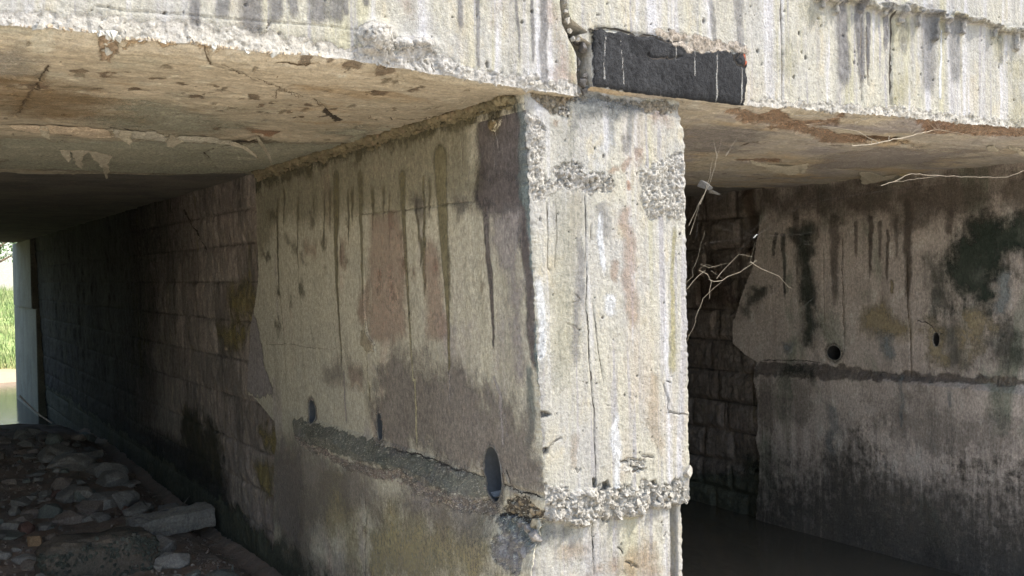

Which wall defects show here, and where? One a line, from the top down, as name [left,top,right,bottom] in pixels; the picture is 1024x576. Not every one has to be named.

crack [15,65,49,116]
crack [199,44,336,117]
spalling [0,11,679,193]
leakage [683,127,764,152]
leakage [254,145,545,575]
leakage [475,102,546,379]
leakage [597,213,606,269]
leakage [694,274,729,305]
leakage [743,148,1024,367]
spalling [294,435,543,576]
crack [387,447,543,537]
leakage [755,430,1024,576]